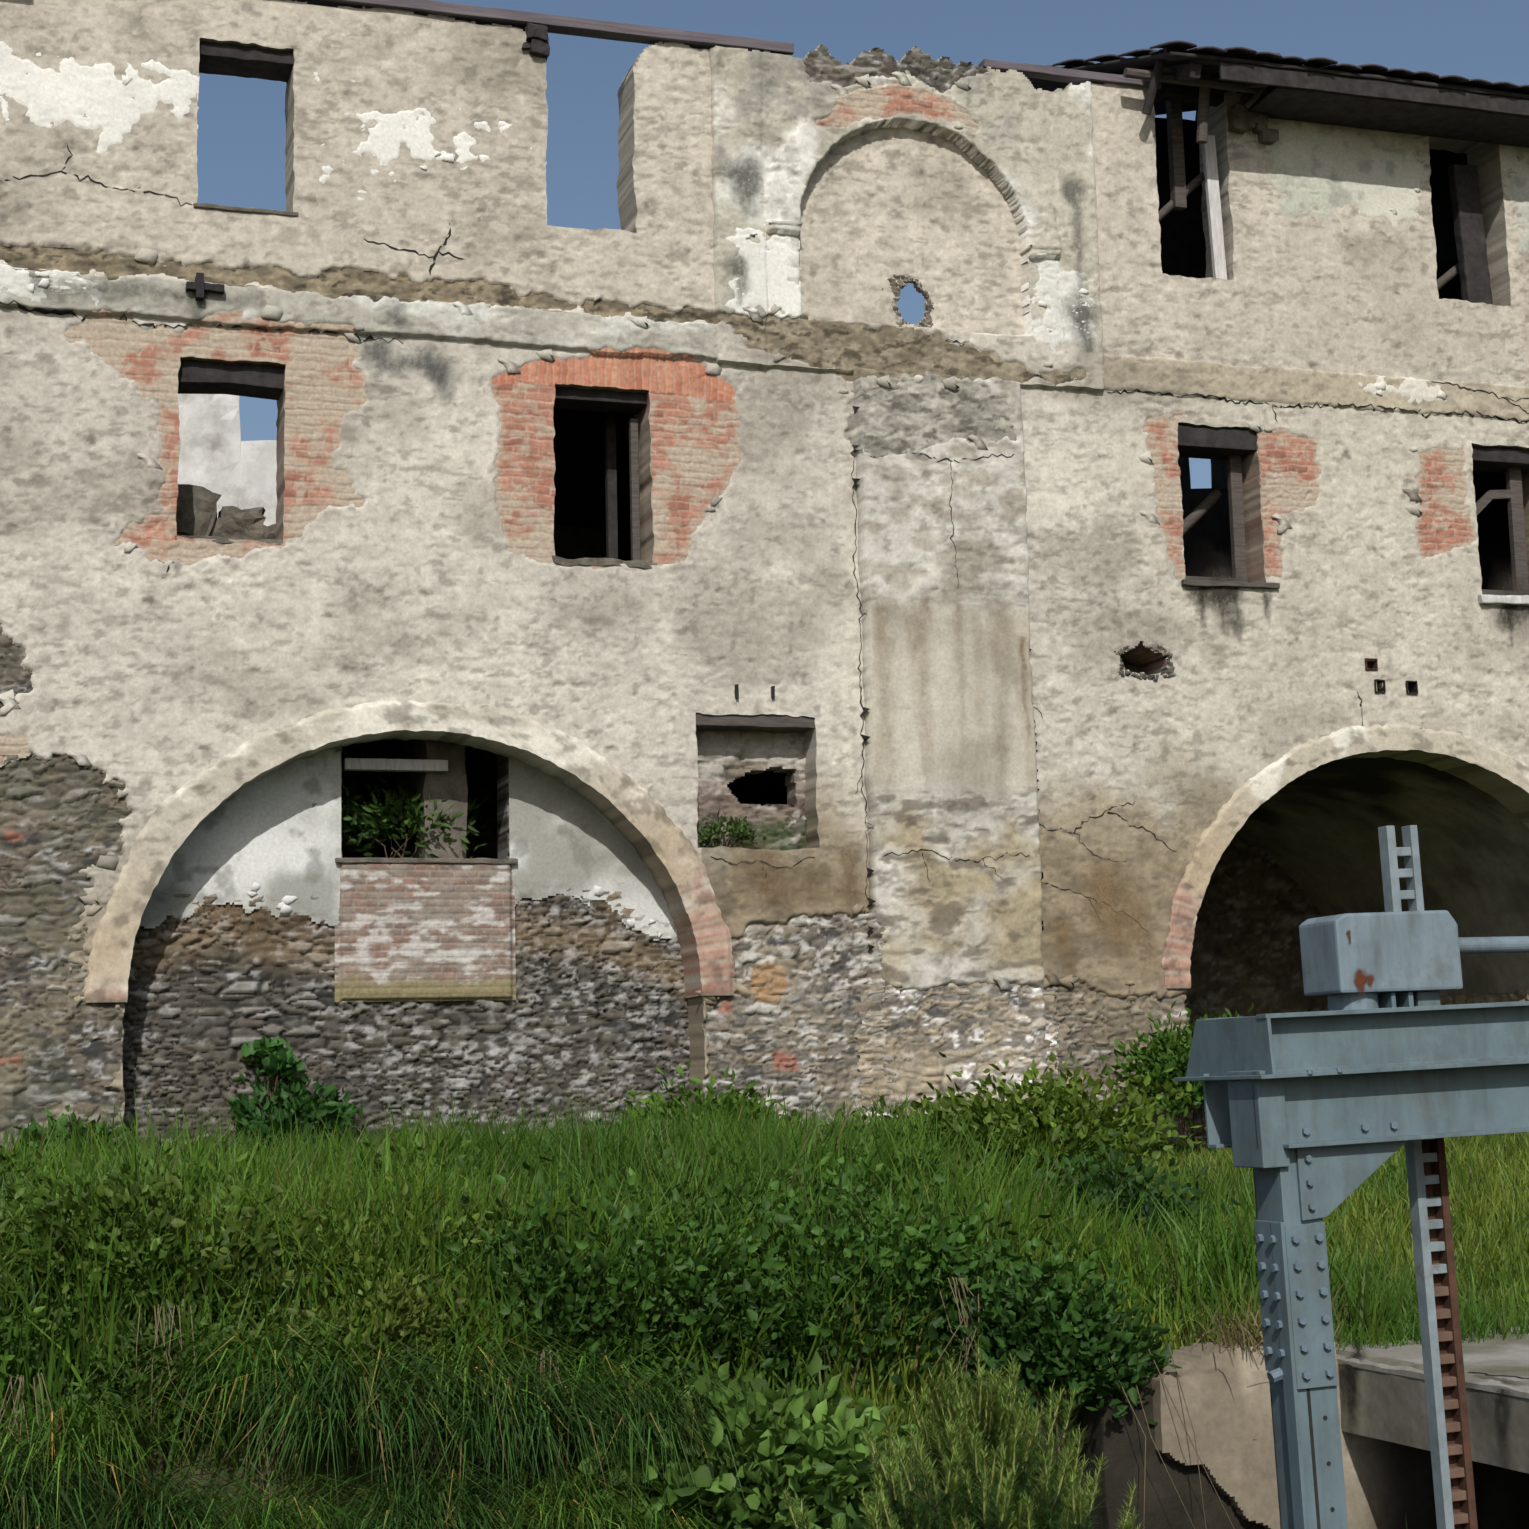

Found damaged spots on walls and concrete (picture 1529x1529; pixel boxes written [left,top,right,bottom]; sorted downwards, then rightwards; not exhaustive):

crack [5,141,193,206]
peeling [0,41,200,153]
crack [364,223,463,275]
peeling [319,108,512,202]
flaking render [0,221,1101,569]
flaking render [1138,410,1186,579]
flaking render [1247,419,1322,579]
flaking render [0,623,33,715]
crack [851,406,1176,952]
leakage [1191,570,1239,619]
flaking render [0,734,132,1151]
flaking render [695,904,1194,1152]